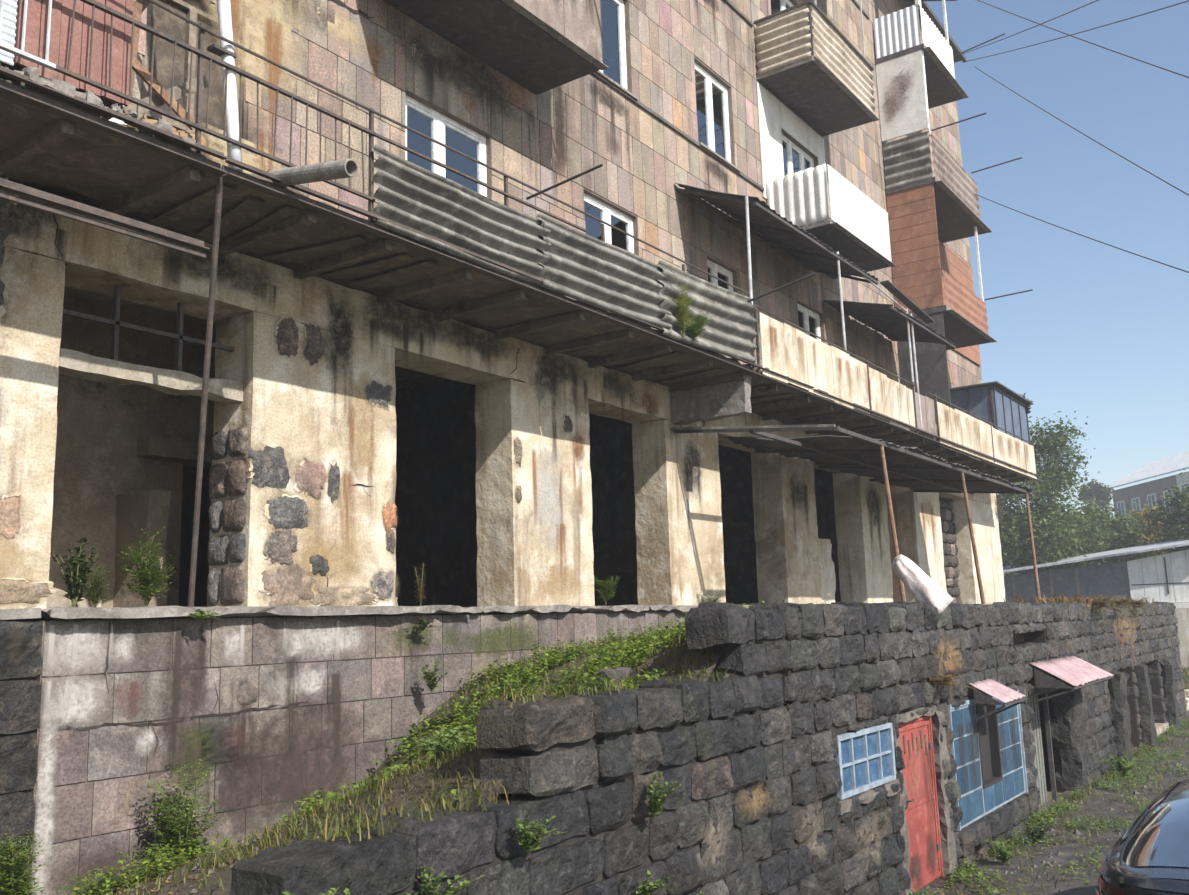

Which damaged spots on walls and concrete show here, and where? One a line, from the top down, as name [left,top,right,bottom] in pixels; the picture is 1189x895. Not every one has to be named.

damp [555,86,566,159]
peeling [0,177,23,330]
peeling [275,315,324,366]
rust [573,437,583,473]
damp [684,448,701,505]
peeling [0,492,21,538]
peeling [207,427,395,607]
peeling [383,499,398,553]
crack [104,623,116,692]
crack [45,687,306,758]
damp [207,620,359,814]